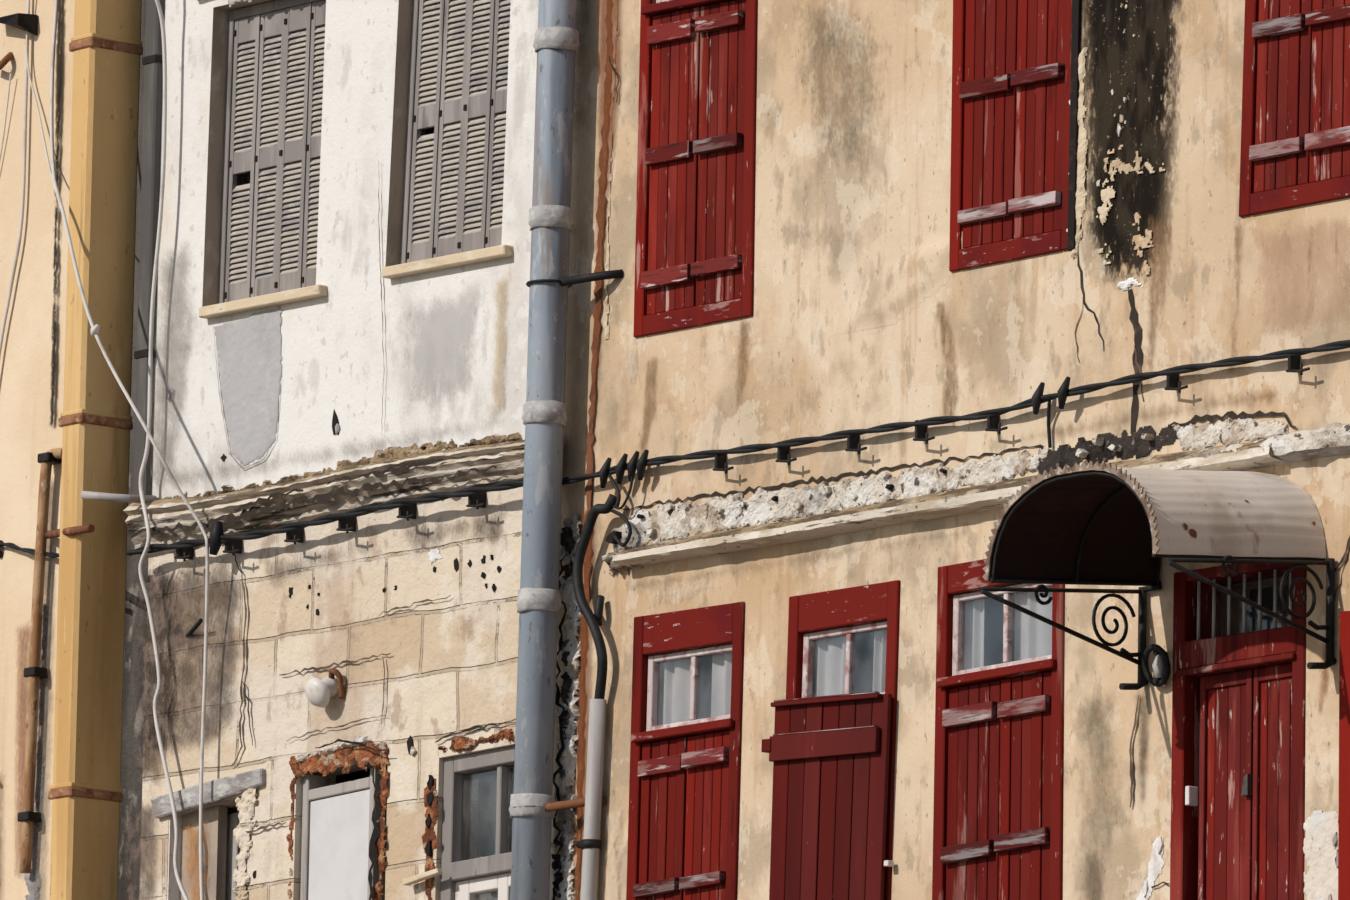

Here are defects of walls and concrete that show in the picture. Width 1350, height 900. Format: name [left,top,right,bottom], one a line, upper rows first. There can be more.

leakage [1067,0,1178,354]
crack [1075,252,1144,434]
spalling [601,410,1296,576]
leakage [140,562,237,776]
spalling [232,787,258,900]
peeling [1303,810,1339,900]